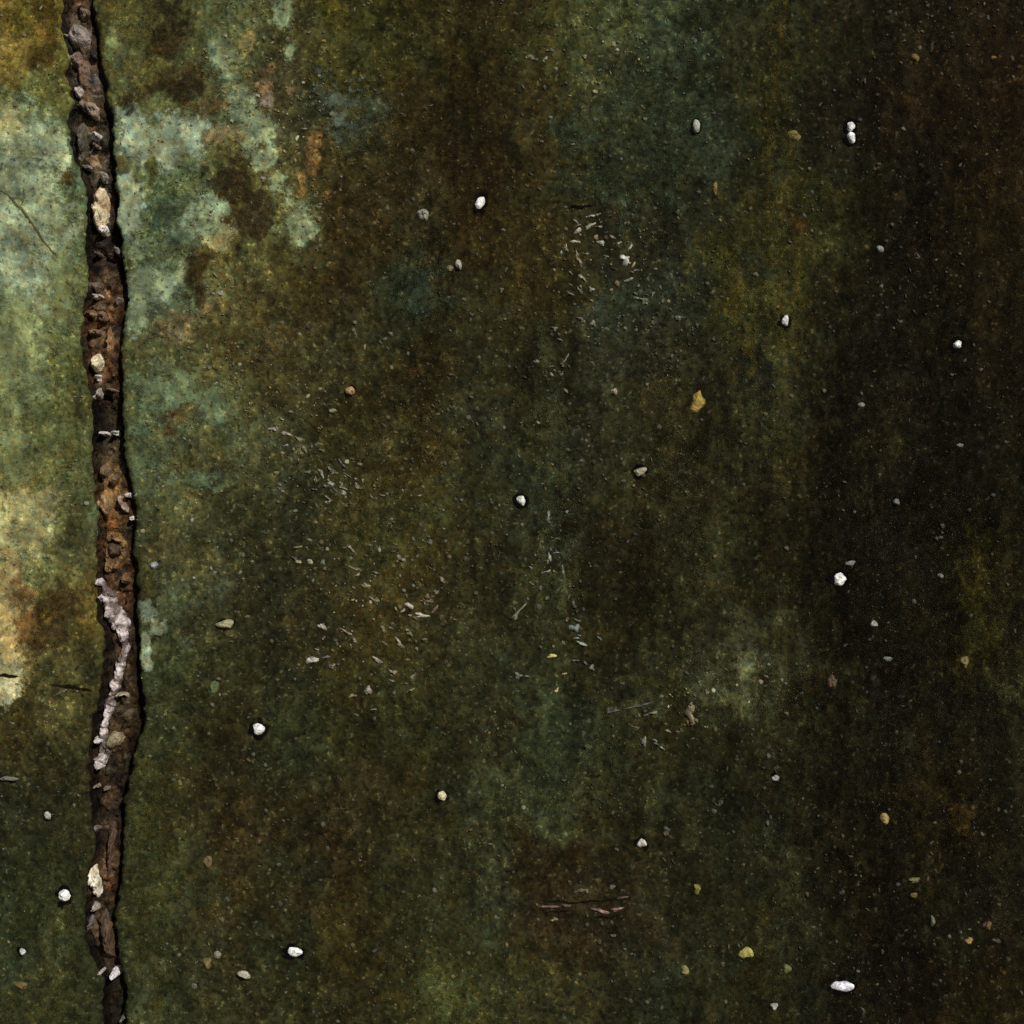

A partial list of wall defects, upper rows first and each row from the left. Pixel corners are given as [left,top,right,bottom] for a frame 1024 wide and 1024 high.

corrosion [116,155,131,174]
corrosion [61,172,76,184]
crack [52,0,146,1024]
crack [0,673,24,686]